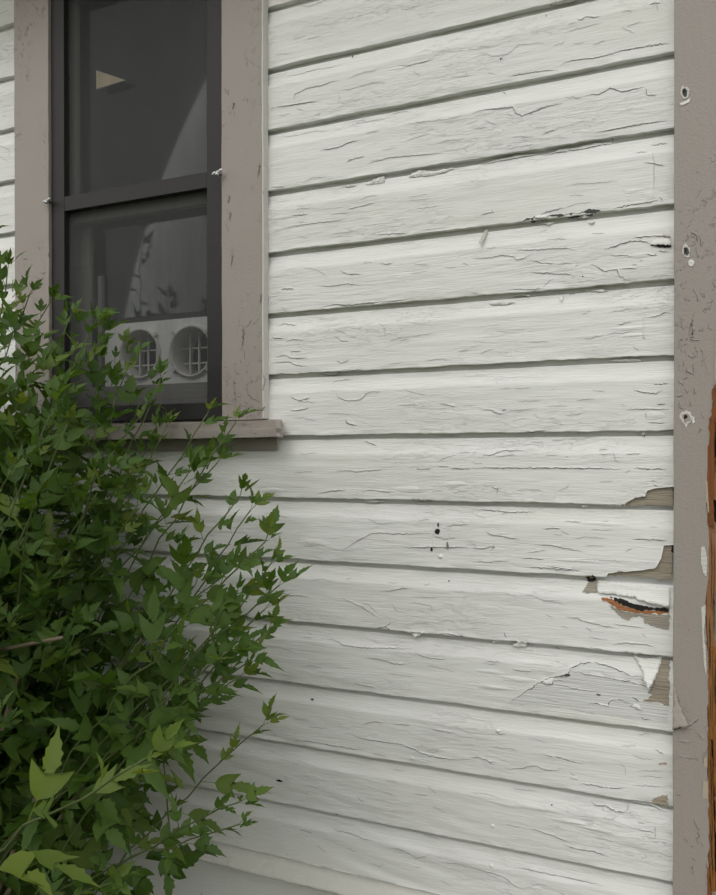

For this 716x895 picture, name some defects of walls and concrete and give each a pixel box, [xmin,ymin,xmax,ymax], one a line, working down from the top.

crack [273,64,667,238]
crack [302,262,431,341]
crack [267,533,716,876]
peeling [509,648,668,724]
crack [442,863,603,895]